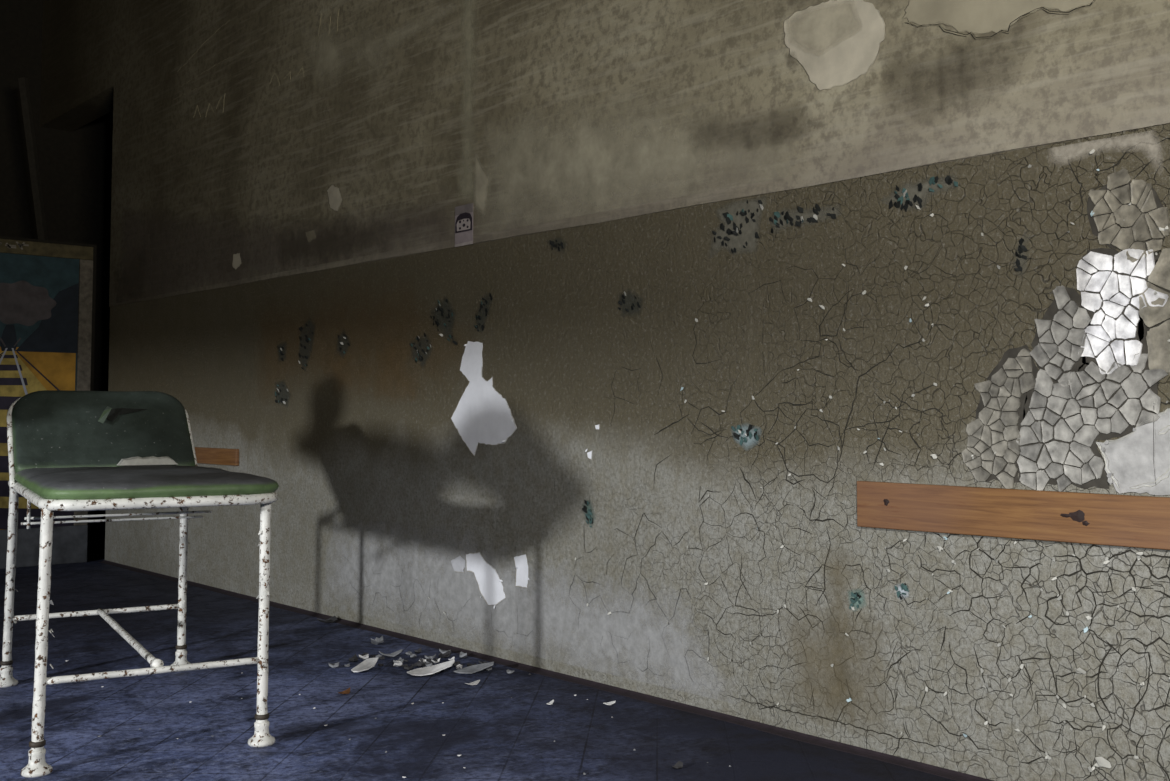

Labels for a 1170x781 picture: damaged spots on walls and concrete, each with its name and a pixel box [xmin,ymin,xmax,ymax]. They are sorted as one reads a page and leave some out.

flaking render [783,0,886,91]
flaking render [903,0,1095,39]
peeling [712,198,838,253]
peeling [409,293,517,456]
peeling [961,168,1170,495]
crack [569,138,1170,781]
peeling [451,552,529,608]